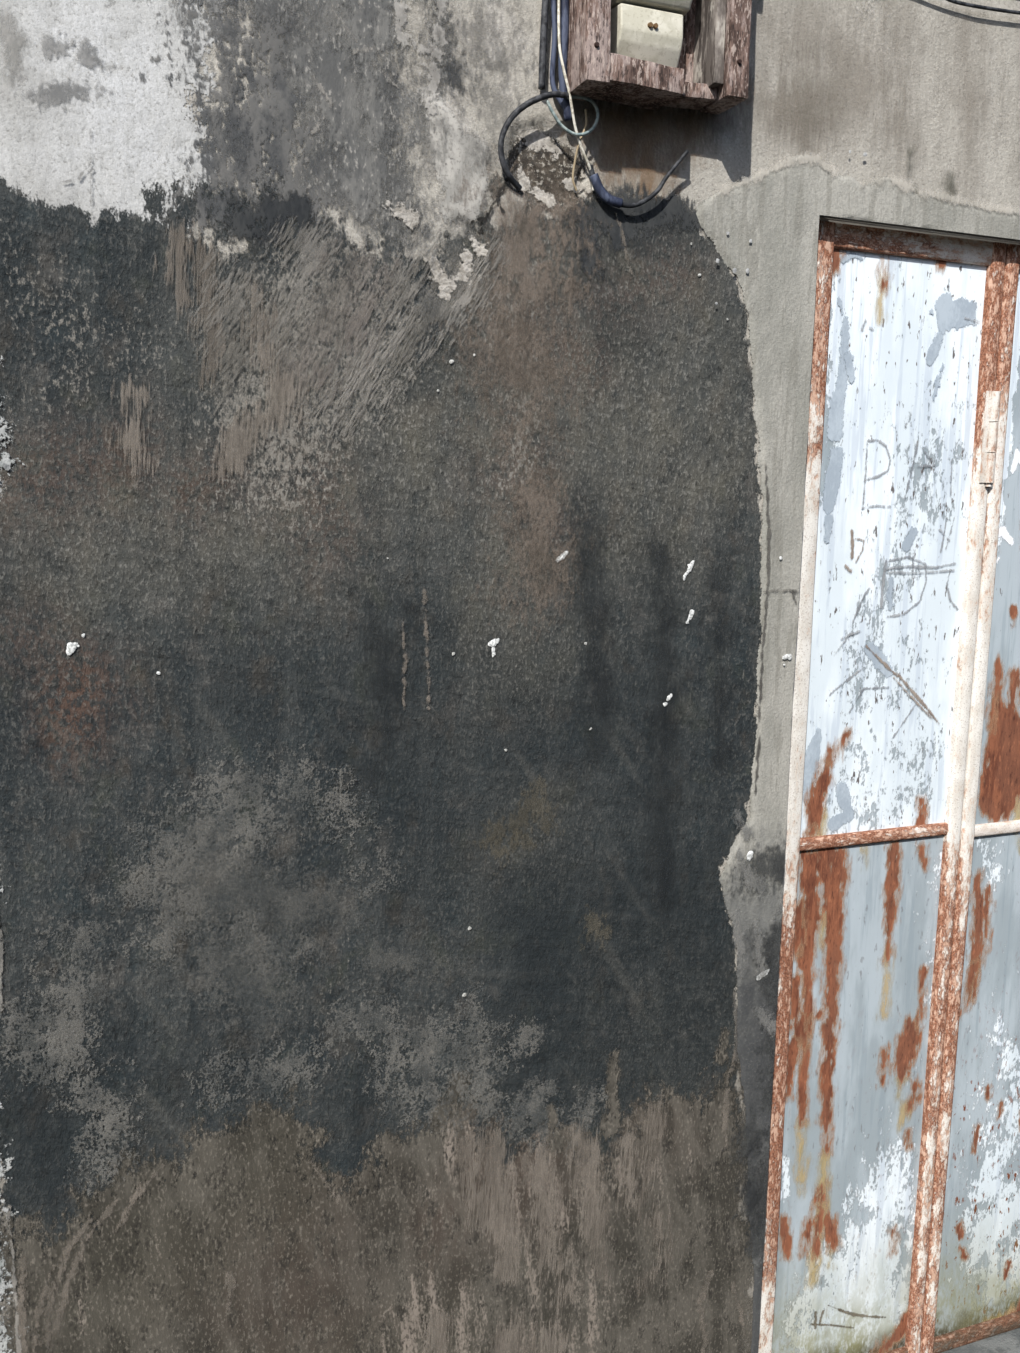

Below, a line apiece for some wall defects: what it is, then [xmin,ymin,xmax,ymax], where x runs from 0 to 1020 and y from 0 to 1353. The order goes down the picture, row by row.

damp [139,0,509,483]
damp [109,375,157,486]
corrosion [915,797,928,826]
corrosion [979,657,1020,823]
damp [729,811,785,1271]
corrosion [780,730,852,1285]
corrosion [880,965,928,1149]
corrosion [882,840,928,1017]
corrosion [960,871,993,1016]
damp [615,1089,680,1298]
damp [14,1218,93,1353]
damp [420,1306,569,1353]